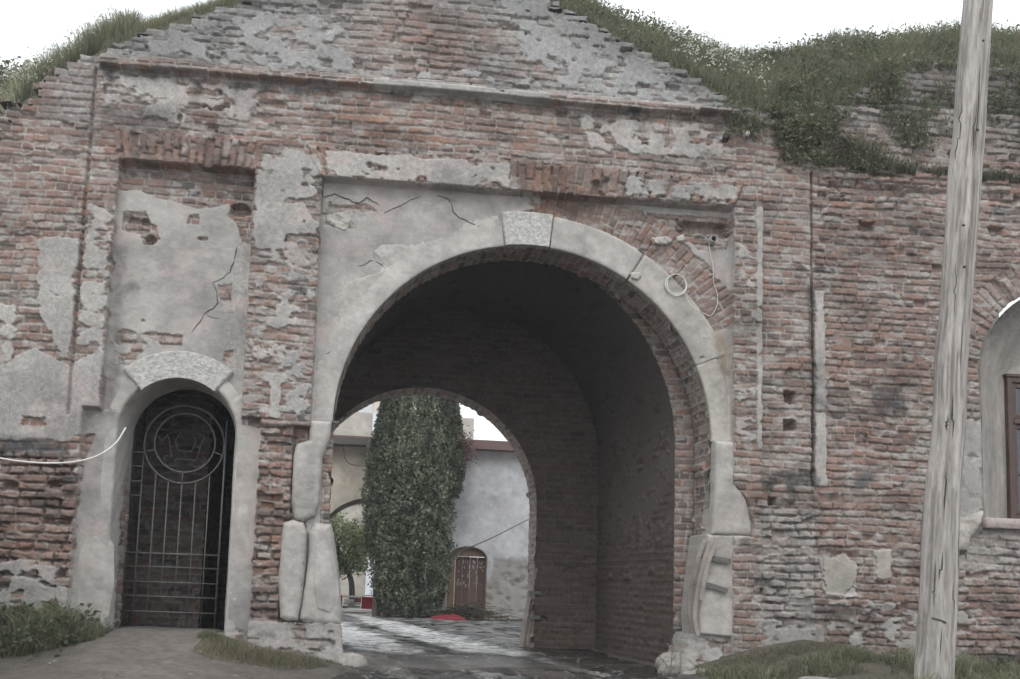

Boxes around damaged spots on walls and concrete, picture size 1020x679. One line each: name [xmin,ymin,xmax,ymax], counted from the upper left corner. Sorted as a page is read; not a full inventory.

spalling [370,2,493,83]
crack [322,193,479,227]
crack [192,247,237,332]
flaking render [122,160,319,384]
spalling [110,327,187,368]
spalling [18,416,46,430]
spalling [0,452,79,602]
spalling [755,495,895,632]